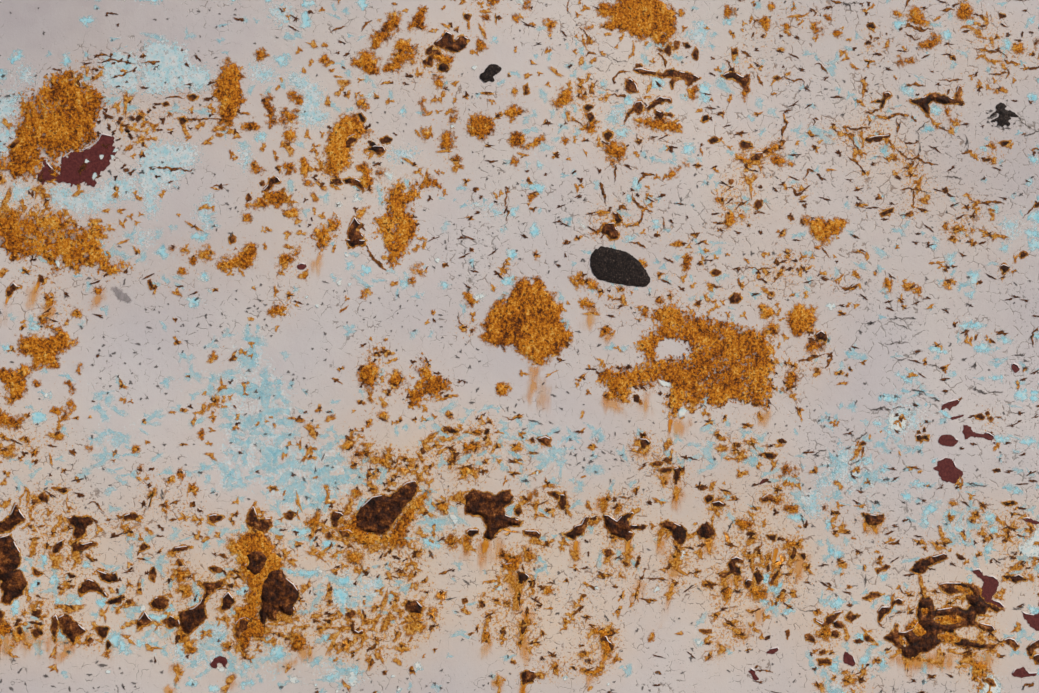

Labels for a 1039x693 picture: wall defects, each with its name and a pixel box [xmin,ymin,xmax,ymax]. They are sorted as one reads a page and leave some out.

peeling [0,115,204,260]
crack [567,1,667,141]
spalling [590,212,650,287]
crack [600,164,665,248]
crack [780,35,1034,238]
crack [905,0,1039,95]
corrosion [120,336,572,693]
corrosion [459,215,866,691]
peeling [873,394,1036,484]
corrosion [913,477,1039,573]
corrosion [813,575,1021,693]
peeling [804,505,1039,693]